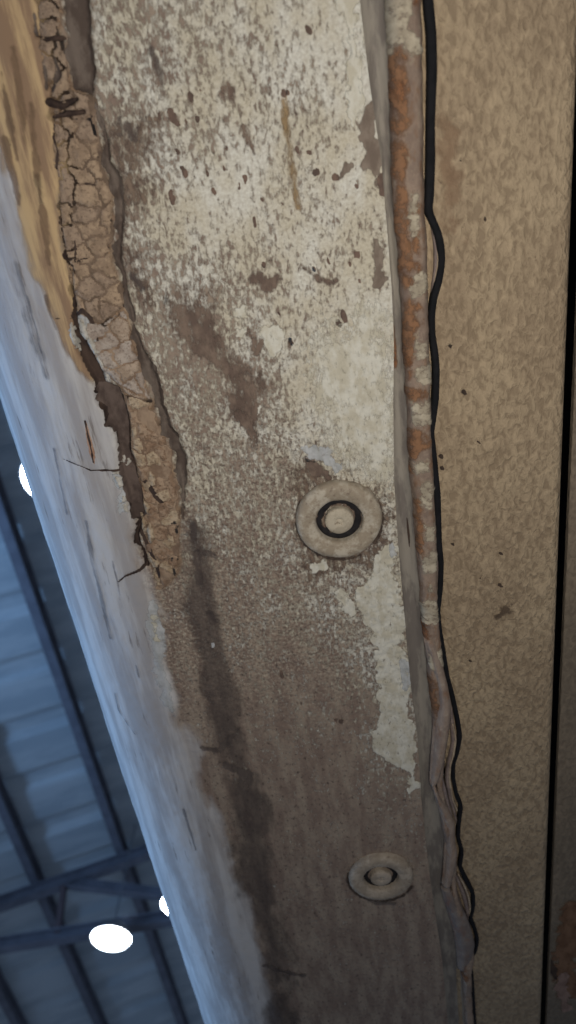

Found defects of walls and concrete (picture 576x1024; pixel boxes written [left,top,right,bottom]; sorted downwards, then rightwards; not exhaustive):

peeling [158,108,200,127]
peeling [38,0,181,712]
crack [33,0,187,582]
leakage [170,284,273,447]
leakage [248,272,283,293]
leakage [303,267,338,285]
corrosion [388,46,427,401]
leakage [189,522,306,1024]
corrosion [426,673,440,716]